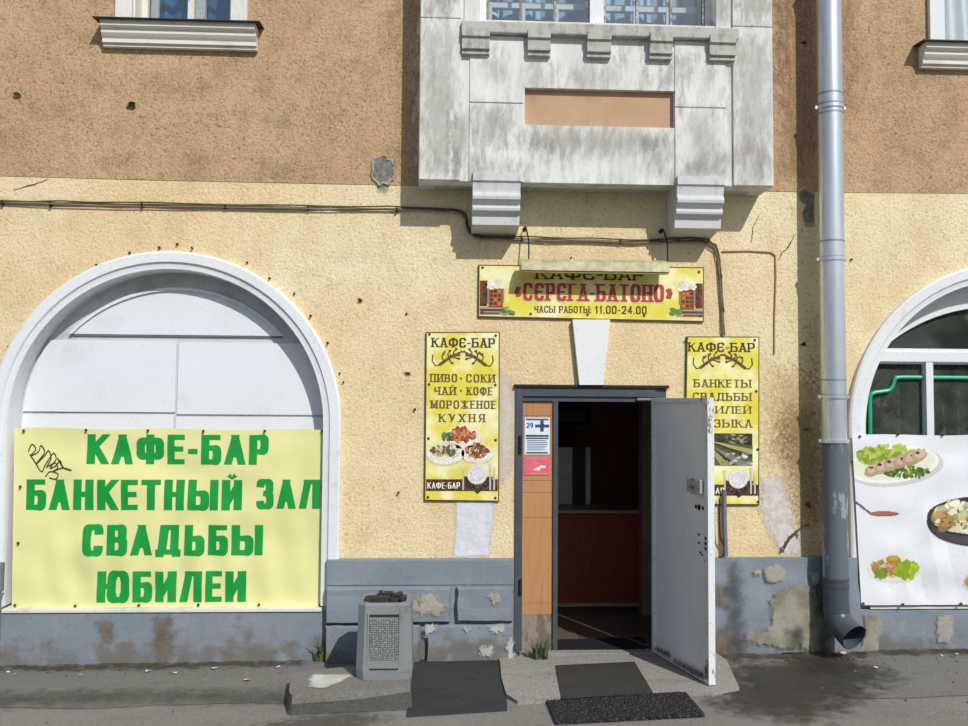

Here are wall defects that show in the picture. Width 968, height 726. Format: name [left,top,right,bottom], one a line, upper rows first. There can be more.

spalling [797,186,815,227]
peeling [746,474,830,654]
peeling [413,593,446,638]
peeling [479,645,494,658]
peeling [490,624,516,658]
peeling [715,629,732,655]
peeling [936,615,953,643]